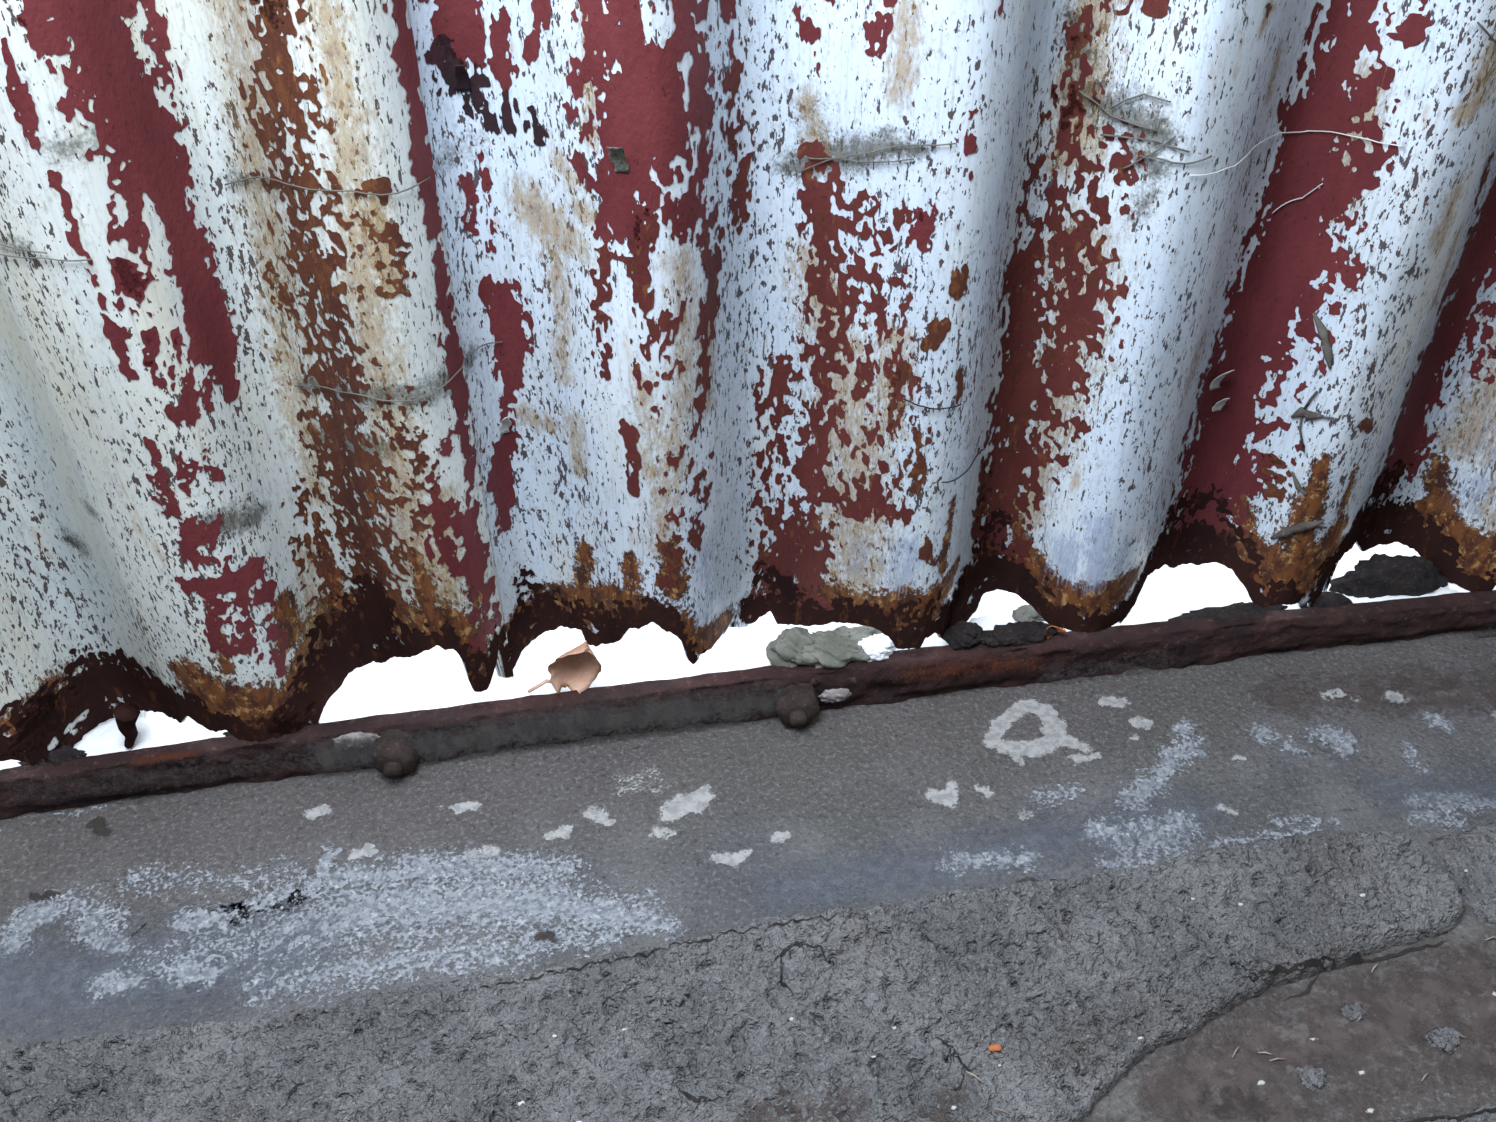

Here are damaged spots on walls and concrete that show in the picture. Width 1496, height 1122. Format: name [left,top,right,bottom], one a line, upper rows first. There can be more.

peeling [1,37,41,150]
peeling [16,0,240,427]
peeling [382,0,755,653]
peeling [793,5,826,83]
peeling [745,139,951,618]
peeling [863,0,897,59]
peeling [971,0,1169,568]
peeling [1164,0,1434,540]
peeling [1375,152,1496,503]
peeling [143,436,289,677]
crack [1237,941,1445,1001]
crack [1405,1107,1496,1122]